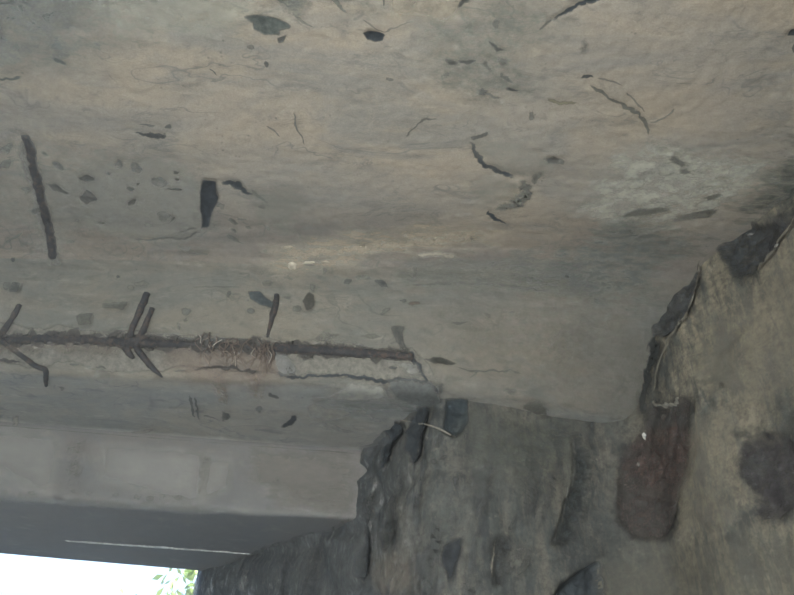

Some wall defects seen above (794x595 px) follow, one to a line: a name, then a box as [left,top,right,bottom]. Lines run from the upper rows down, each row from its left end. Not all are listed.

rust [170,348,278,402]